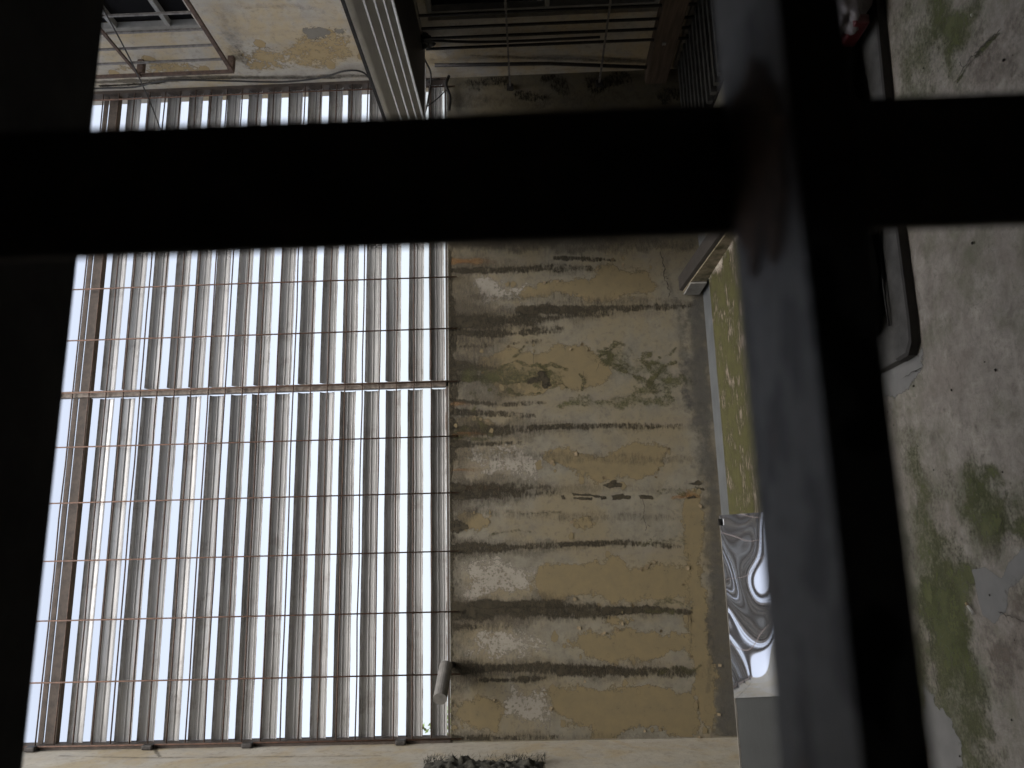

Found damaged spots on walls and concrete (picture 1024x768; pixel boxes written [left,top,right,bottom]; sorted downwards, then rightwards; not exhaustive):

peeling [242,26,362,71]
peeling [477,342,612,399]
peeling [453,415,671,500]
water stain [448,240,737,741]
peeling [457,479,722,739]